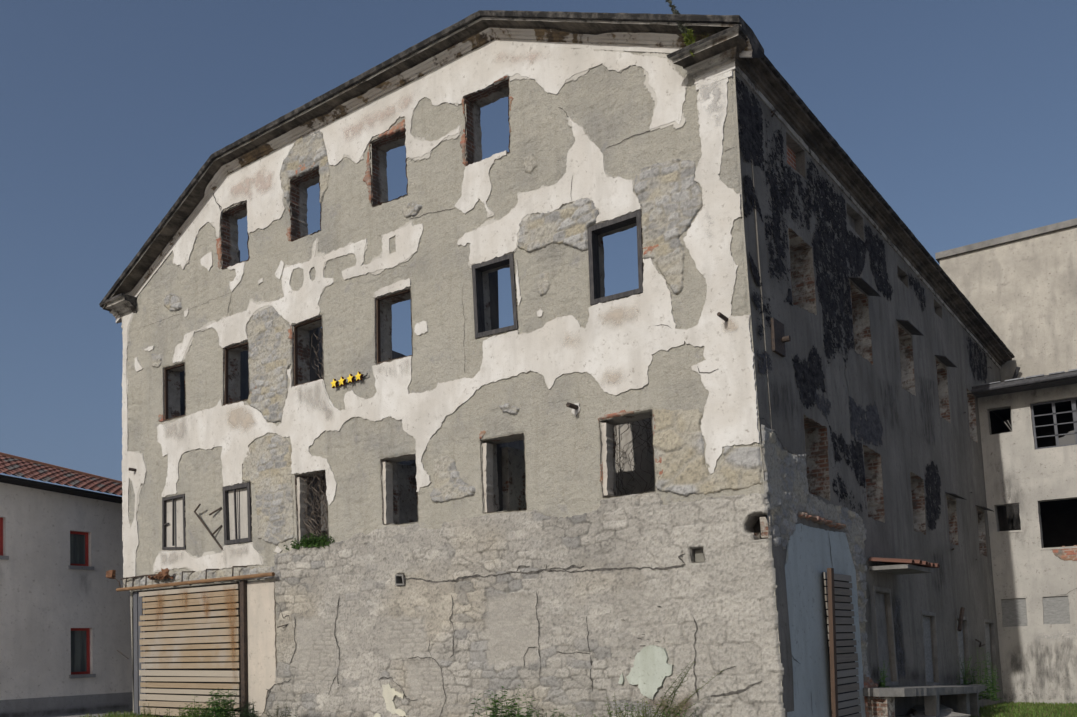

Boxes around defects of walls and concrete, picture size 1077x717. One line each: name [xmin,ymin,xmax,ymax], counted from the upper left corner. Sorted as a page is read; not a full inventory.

spalling [121,39,893,717]
flaking render [1051,545,1077,561]
crack [329,598,341,693]
crack [380,554,686,717]